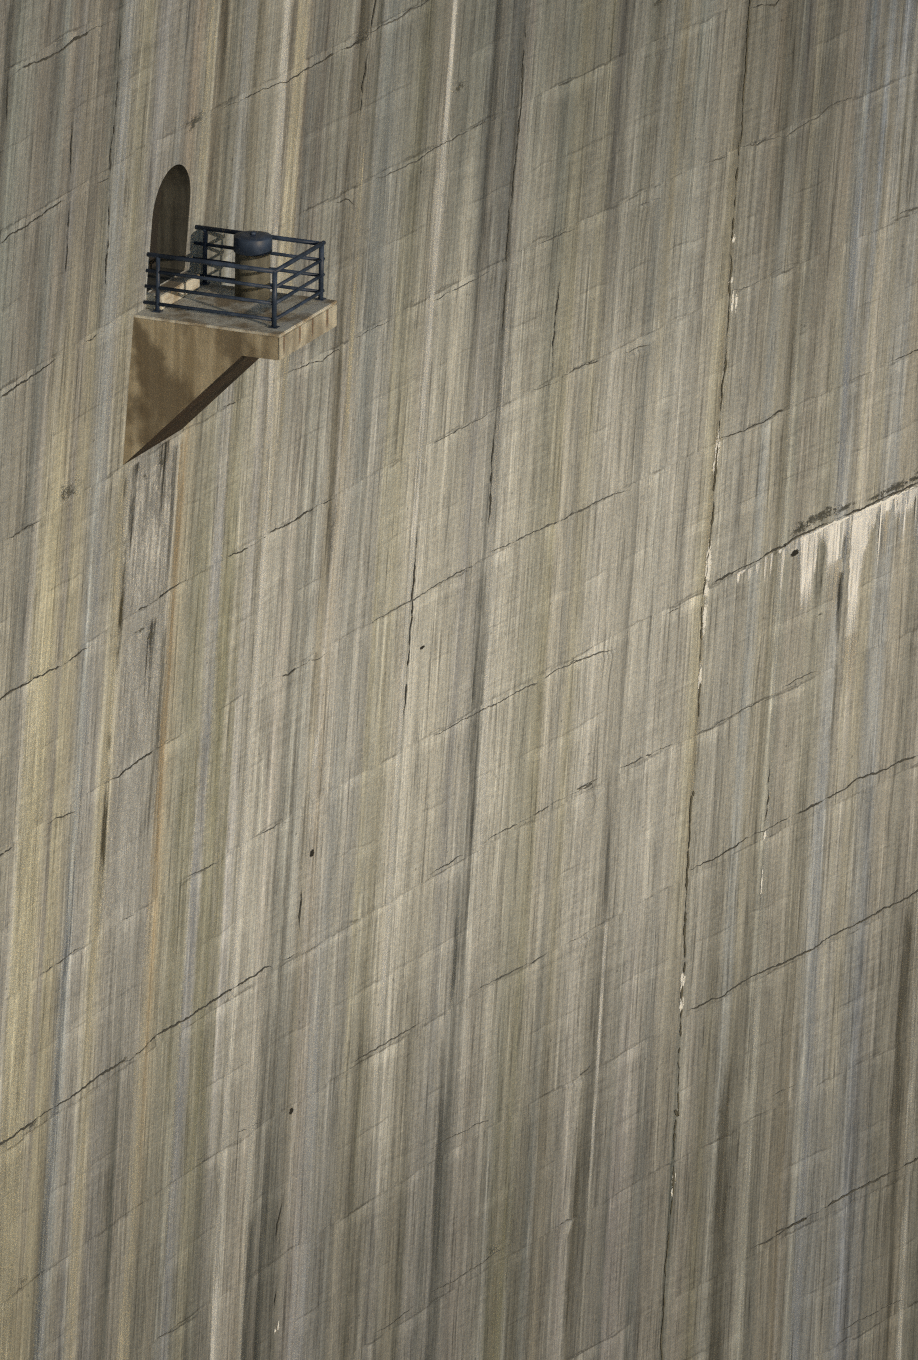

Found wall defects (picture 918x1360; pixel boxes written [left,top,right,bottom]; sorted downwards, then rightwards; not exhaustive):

crack [670,483,918,613]
leakage [737,472,918,684]
crack [439,650,610,734]